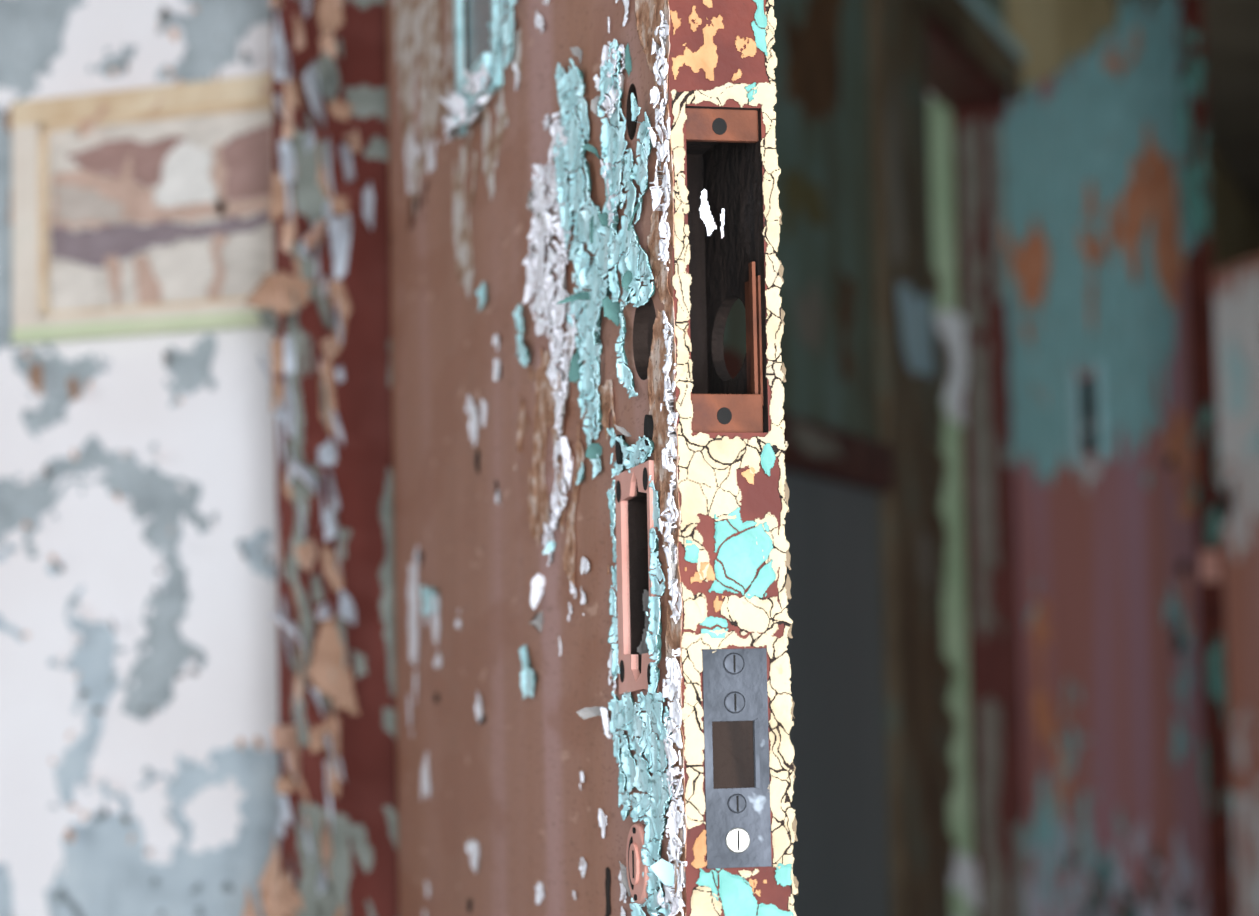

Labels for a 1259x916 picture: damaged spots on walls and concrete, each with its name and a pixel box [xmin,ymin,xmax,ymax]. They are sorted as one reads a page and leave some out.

peeling [988,0,1210,488]
peeling [0,0,521,916]
peeling [513,0,842,916]
peeling [897,264,968,593]
peeling [1191,263,1259,561]
peeling [939,652,957,799]
peeling [944,828,979,910]